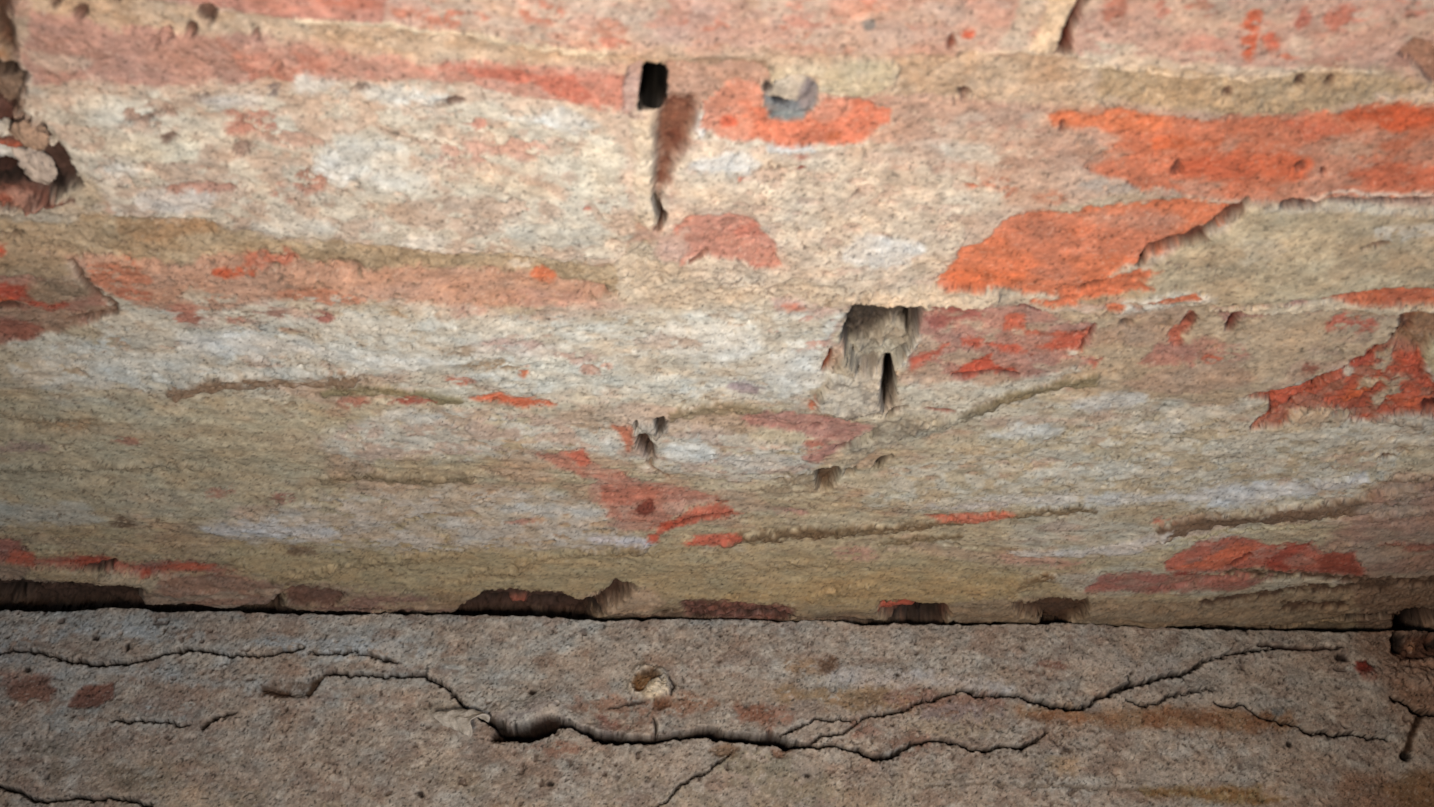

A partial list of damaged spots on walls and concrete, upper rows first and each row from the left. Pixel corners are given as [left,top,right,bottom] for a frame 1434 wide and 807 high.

peeling [0,0,1434,596]
crack [0,597,1434,807]